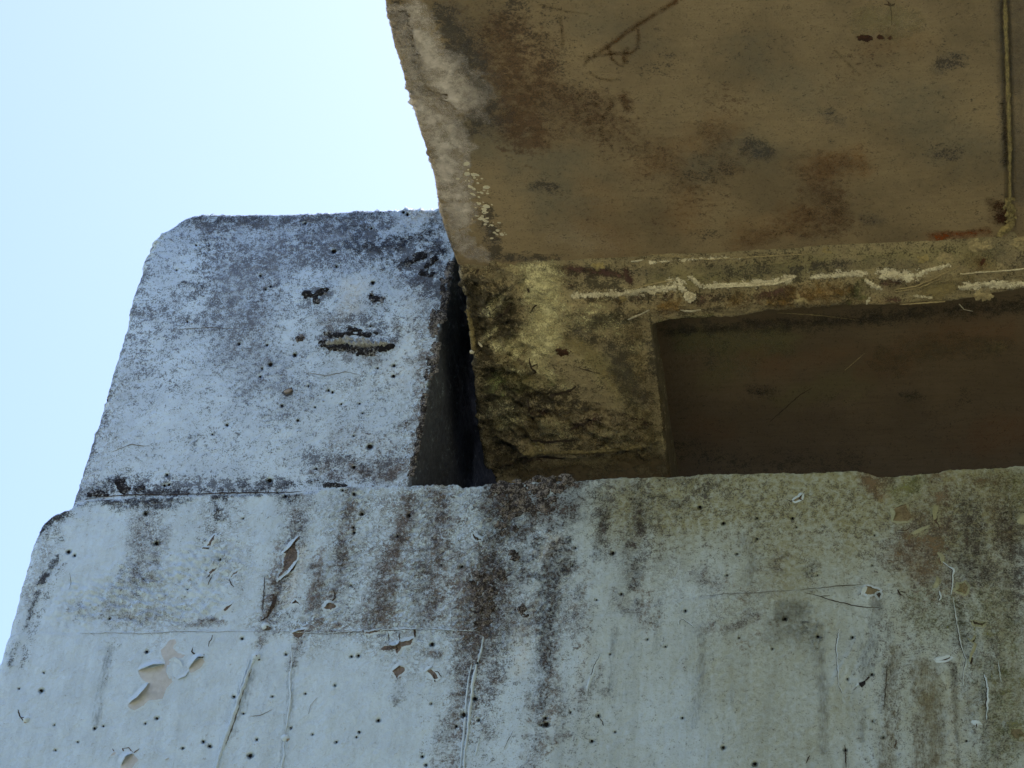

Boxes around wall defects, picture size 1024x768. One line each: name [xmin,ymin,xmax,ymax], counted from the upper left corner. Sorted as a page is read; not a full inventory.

water stain [387,0,567,259]
rust [931,199,1007,241]
water stain [649,254,806,265]
spalling [318,325,395,357]
water stain [432,257,1024,768]
water stain [256,501,303,647]
peeling [261,535,303,621]
water stain [363,484,453,630]
crack [709,584,878,608]
peeling [126,637,207,713]
peeling [362,628,416,680]
peeling [424,665,441,682]